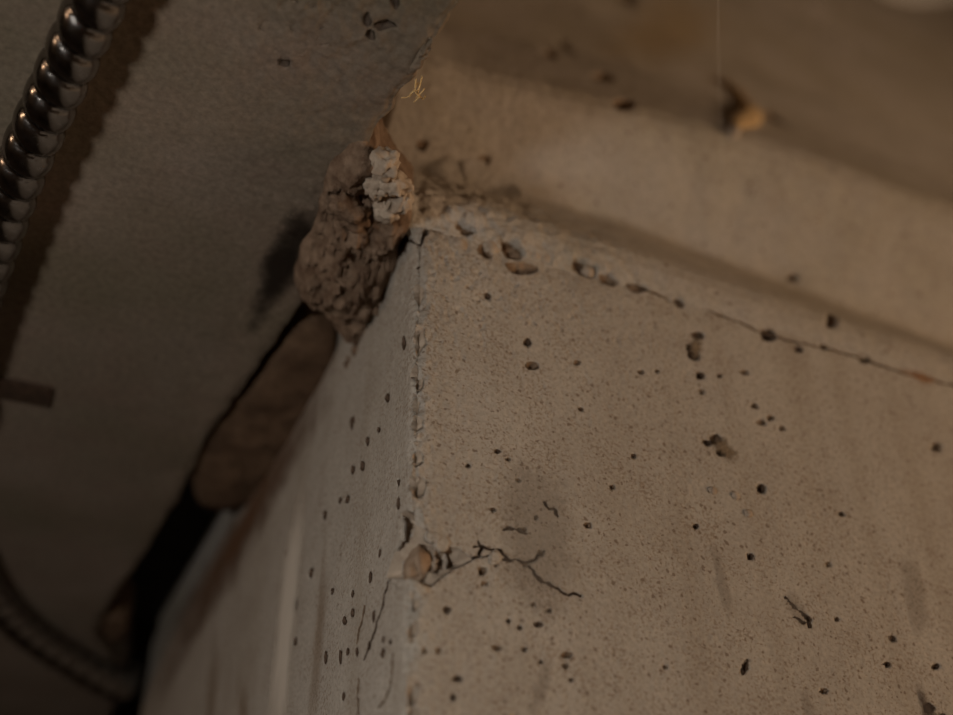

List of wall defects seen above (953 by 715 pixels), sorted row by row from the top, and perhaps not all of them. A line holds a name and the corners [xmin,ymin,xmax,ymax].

crack [403,225,953,386]
crack [471,526,582,597]
crack [356,581,394,715]